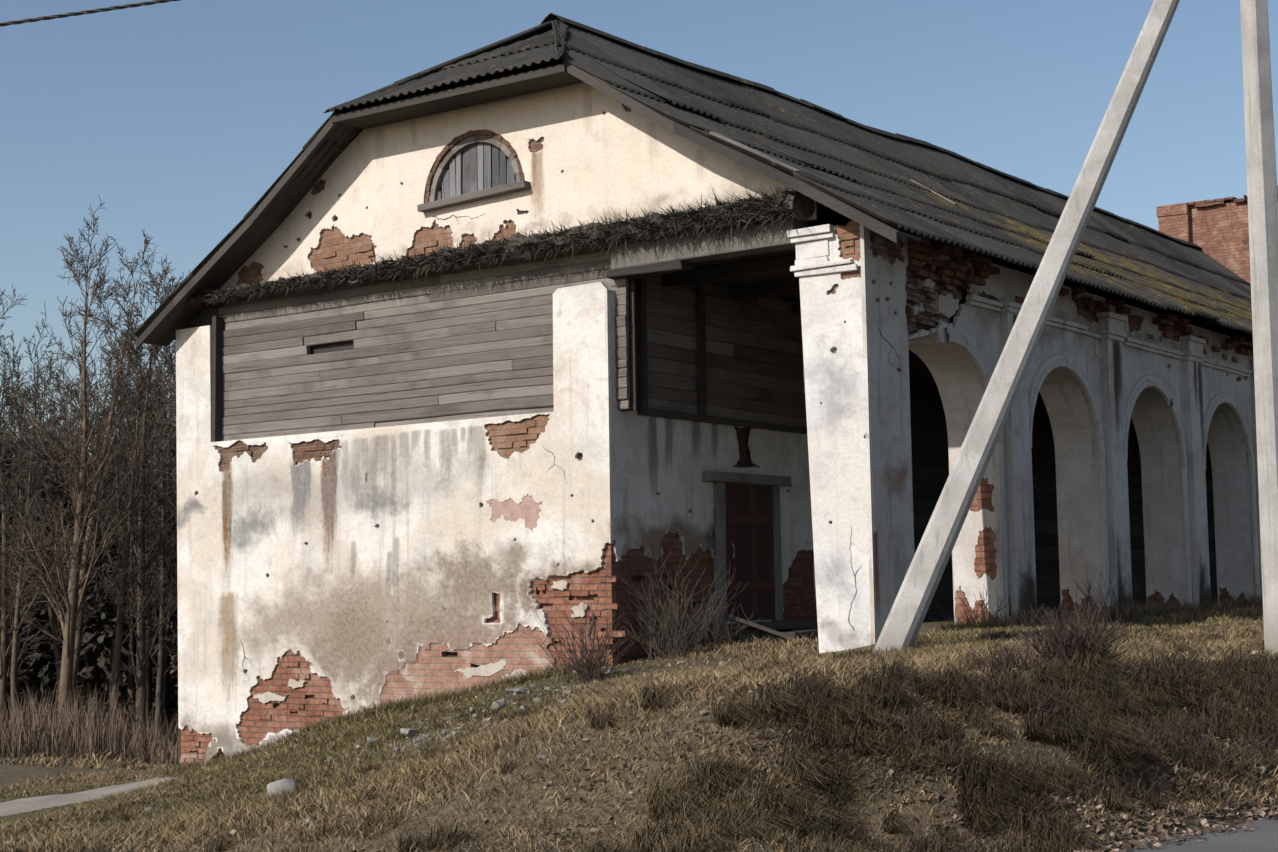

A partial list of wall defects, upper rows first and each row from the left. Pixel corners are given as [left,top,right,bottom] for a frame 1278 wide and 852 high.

spalling [286,216,377,272]
spalling [402,209,530,260]
spalling [486,414,549,459]
flaking render [482,495,542,531]
spalling [970,477,994,512]
spalling [973,526,997,580]
leakage [252,548,520,692]
spalling [369,532,717,711]
spalling [782,550,817,639]
spalling [955,586,993,627]
spalling [238,650,356,746]
spalling [178,725,216,769]